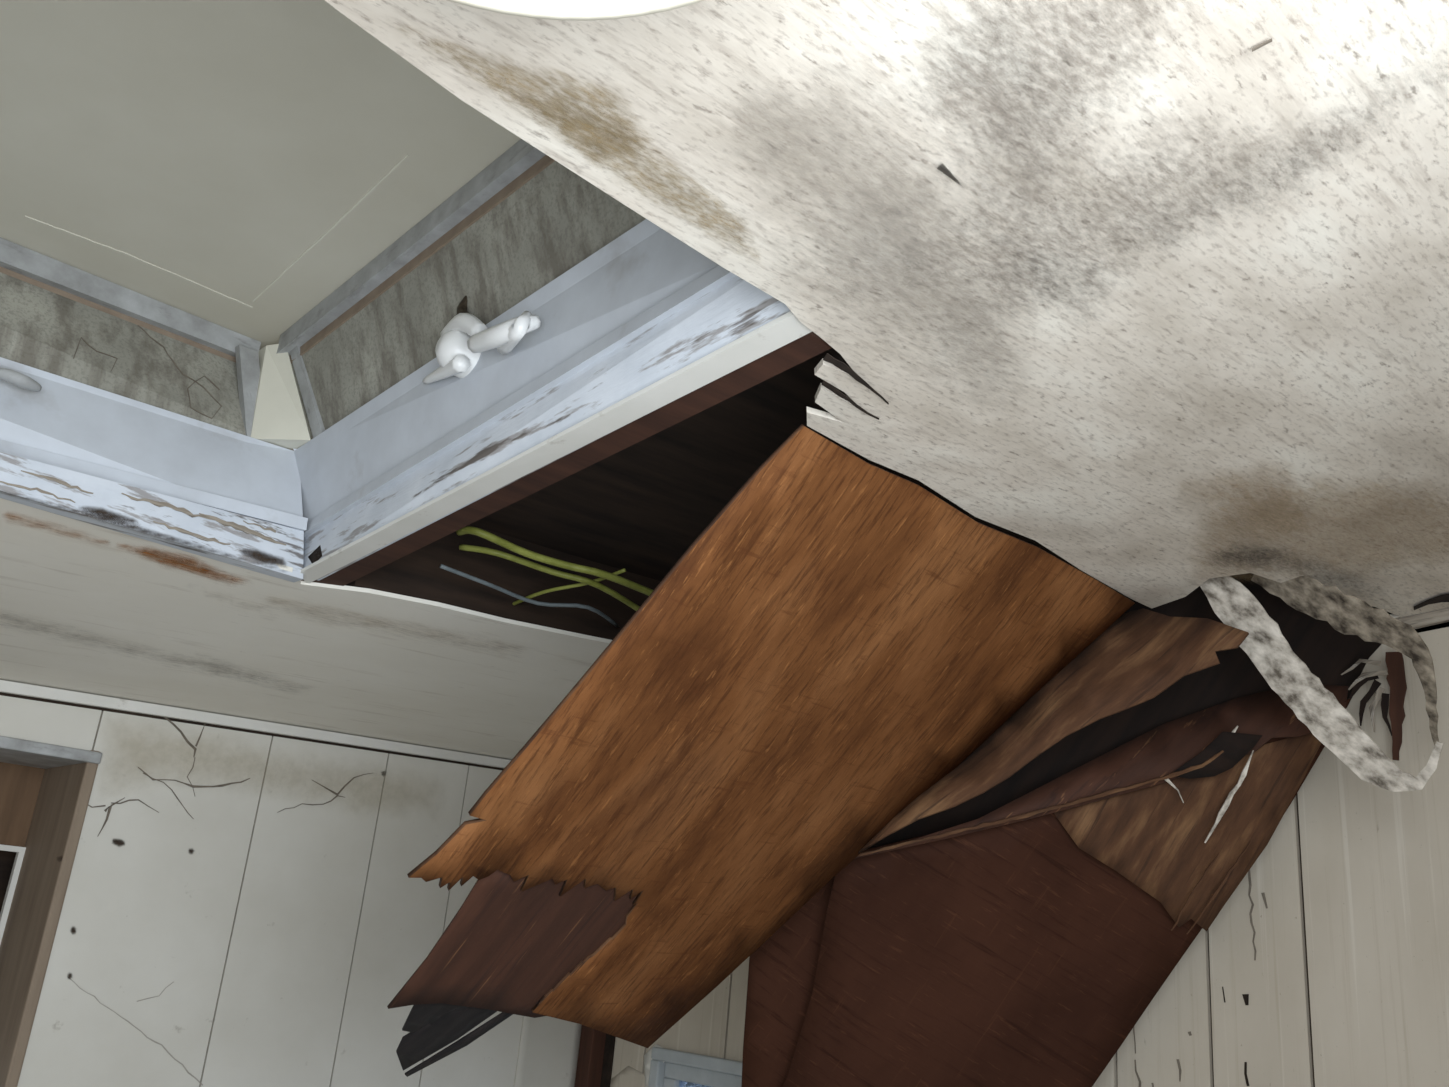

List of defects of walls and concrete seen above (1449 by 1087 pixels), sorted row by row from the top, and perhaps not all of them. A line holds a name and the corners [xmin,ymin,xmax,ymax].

water stain [455,56,741,240]
peeling [308,546,322,563]
crack [88,717,250,837]
crack [277,773,371,813]
peeling [1054,733,1321,932]
peeling [610,1044,664,1087]